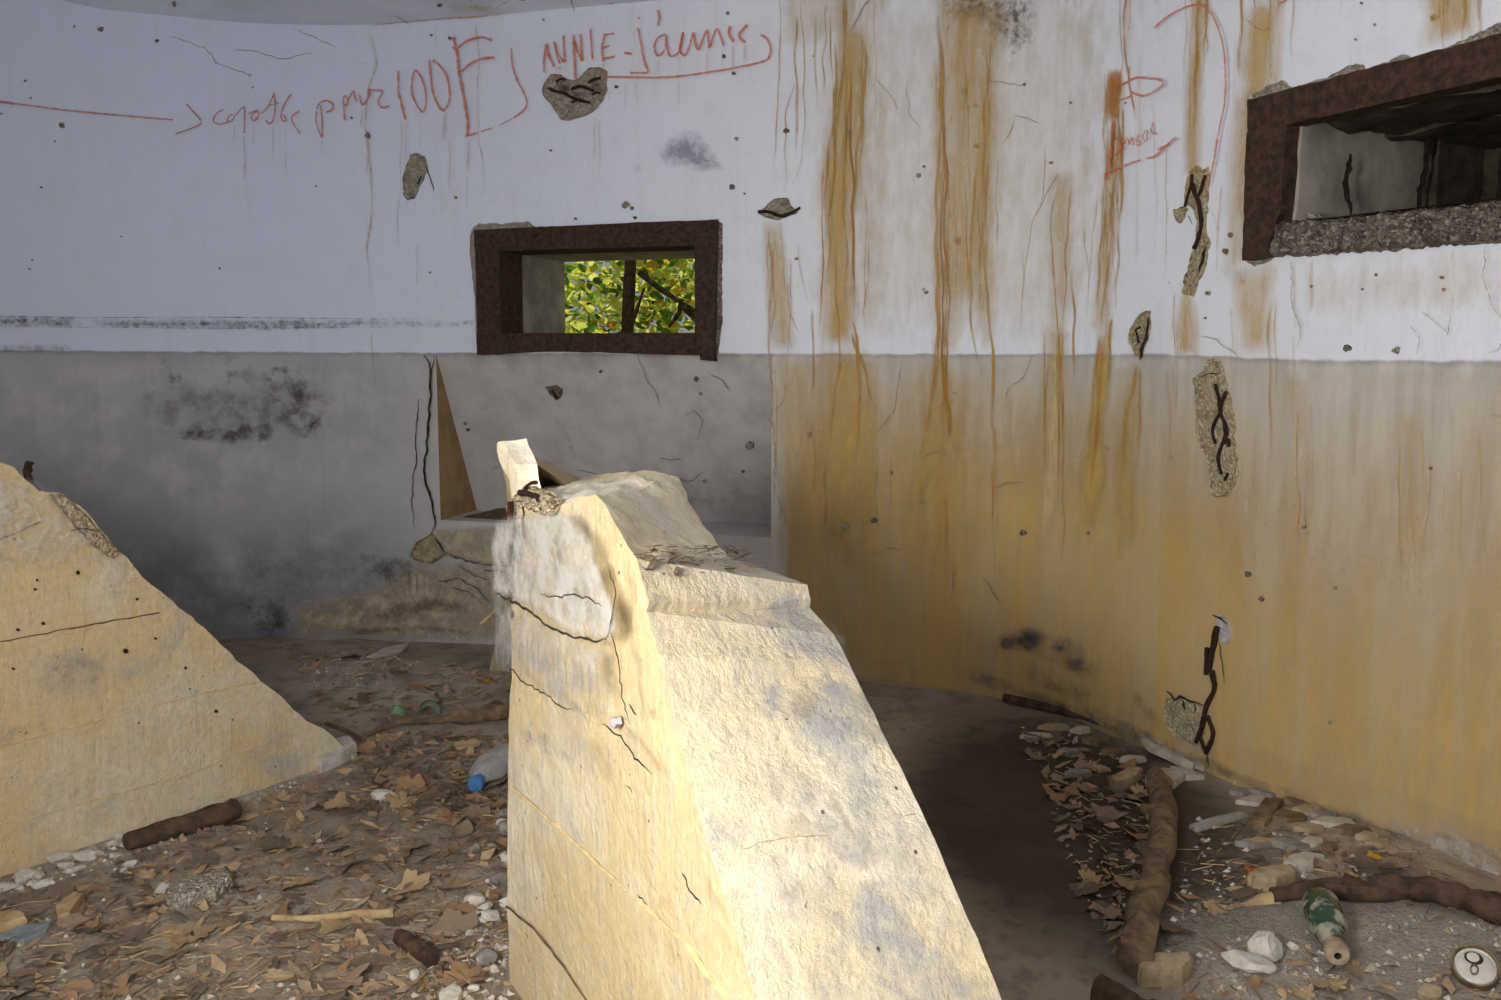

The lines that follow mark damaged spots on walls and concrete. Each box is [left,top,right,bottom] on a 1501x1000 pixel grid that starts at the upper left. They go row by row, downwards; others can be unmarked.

spalling [402,153,434,201]
spalling [542,67,619,121]
corrosion [821,9,873,543]
corrosion [917,3,997,495]
corrosion [1098,0,1134,287]
spalling [1128,310,1151,360]
corrosion [1238,0,1274,208]
spalling [1173,165,1501,297]
water stain [223,427,266,440]
corrosion [1082,318,1111,516]
spalling [1192,358,1239,497]
spalling [1163,615,1232,767]